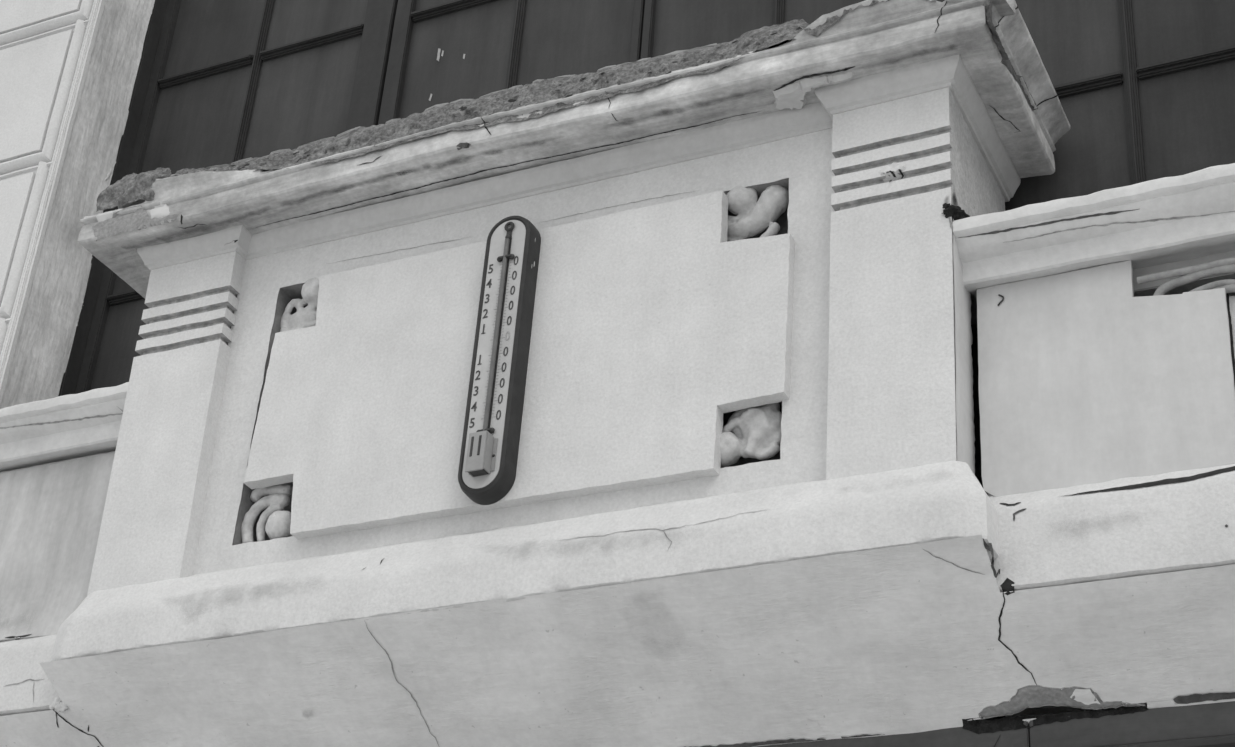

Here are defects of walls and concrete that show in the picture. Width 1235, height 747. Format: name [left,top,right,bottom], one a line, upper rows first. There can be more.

peeling [985,1,1038,111]
spalling [92,0,889,241]
spalling [879,162,907,182]
crack [565,510,762,549]
crack [923,549,1037,685]
crack [364,620,439,746]
spalling [962,685,1149,734]
peeling [1173,692,1235,704]